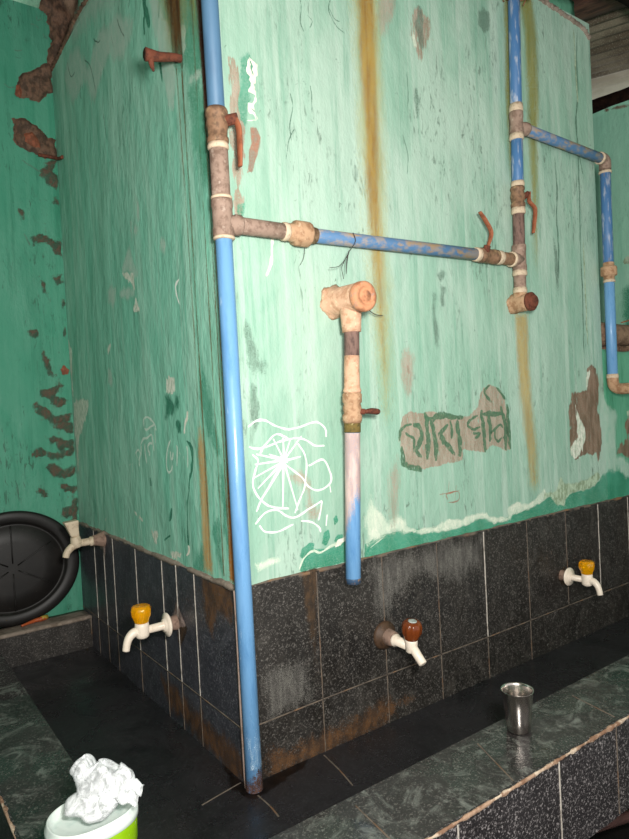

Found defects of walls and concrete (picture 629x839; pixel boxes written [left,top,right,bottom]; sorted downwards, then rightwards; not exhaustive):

spalling [15,0,88,103]
spalling [11,118,59,206]
corrosion [346,0,391,237]
spalling [31,228,63,257]
corrosion [156,0,235,641]
corrosion [359,249,398,427]
spalling [32,327,89,520]
peeling [398,384,511,470]
corrosion [514,312,540,494]
peeling [568,365,629,479]
water stain [258,658,318,728]
water stain [262,692,416,778]